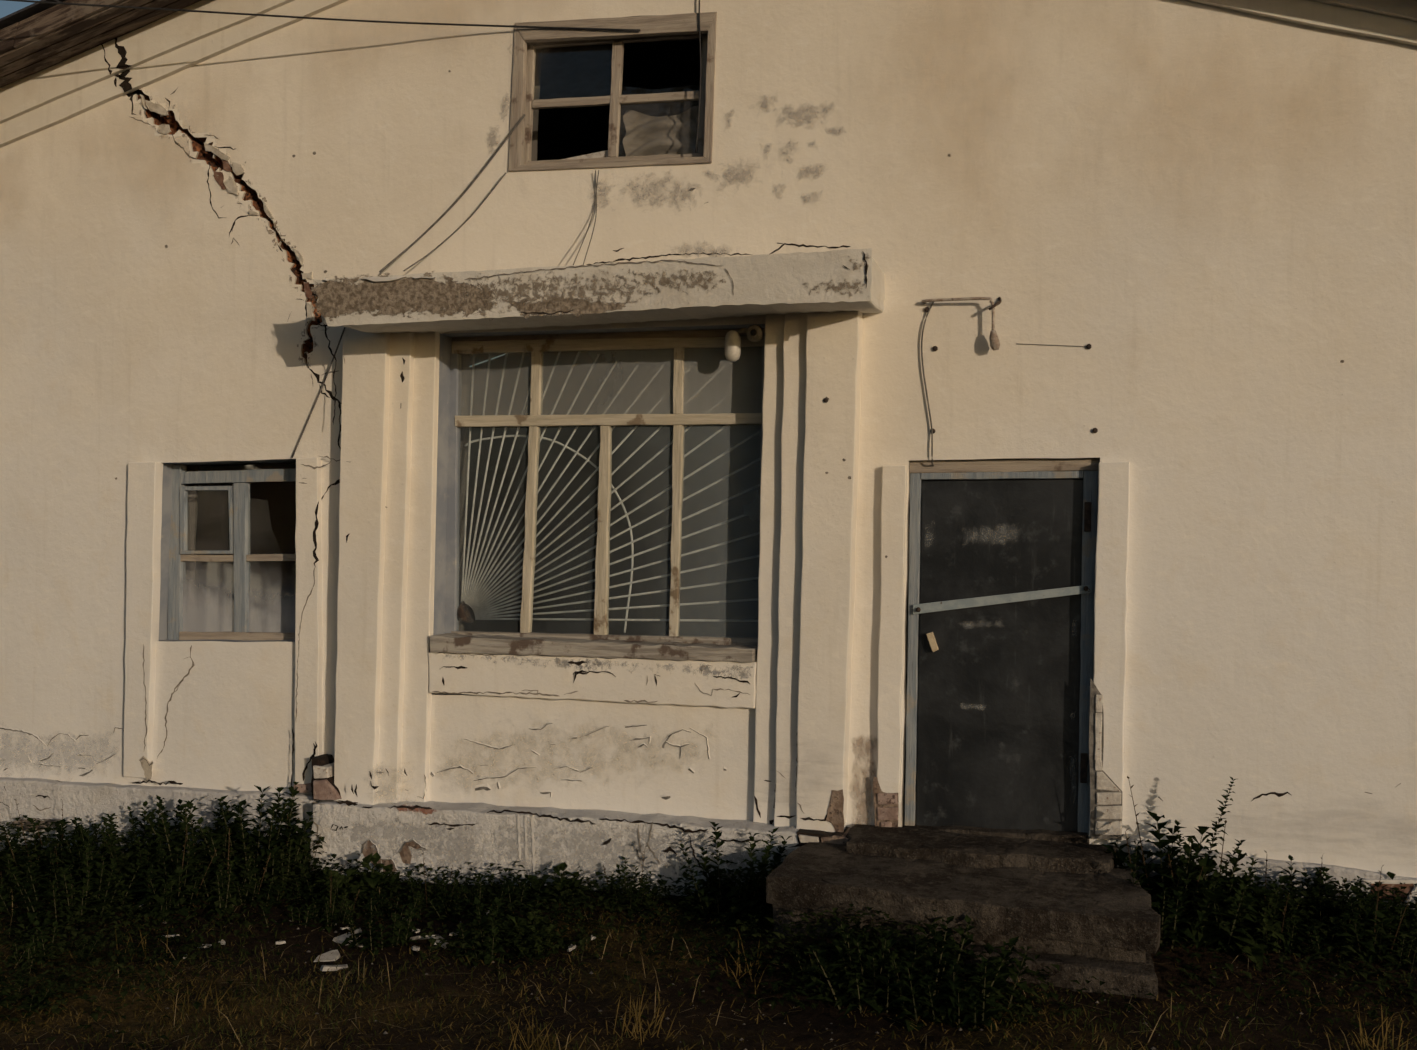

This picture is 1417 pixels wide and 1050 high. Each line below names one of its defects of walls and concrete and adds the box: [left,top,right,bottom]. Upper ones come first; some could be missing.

spalling [311,270,726,321]
peeling [803,256,868,296]
crack [101,37,349,720]
crack [133,645,194,785]
peeling [0,726,116,776]
flaking render [1089,679,1122,840]
spalling [781,789,851,859]
flaking render [873,777,899,828]